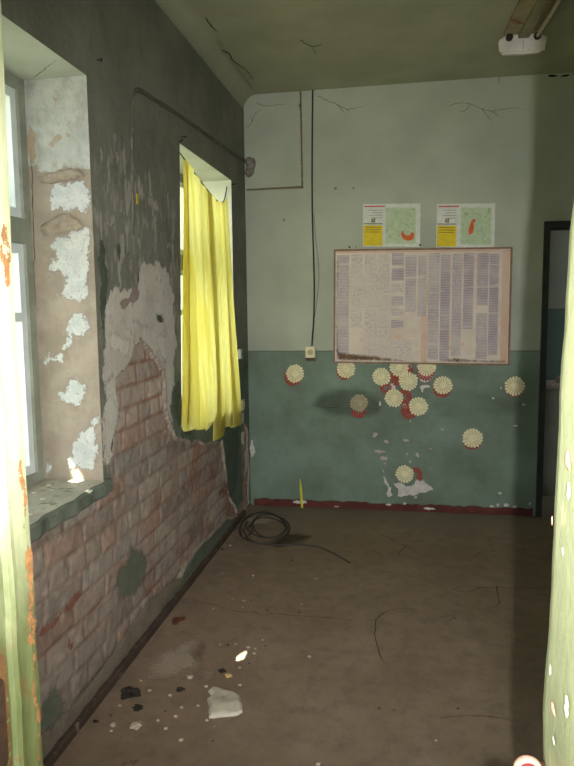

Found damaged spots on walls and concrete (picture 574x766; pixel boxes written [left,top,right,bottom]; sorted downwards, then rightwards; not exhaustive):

peeling [0,224,11,300]
peeling [18,459,27,517]
flaking render [25,133,255,763]
flaking render [373,432,433,506]